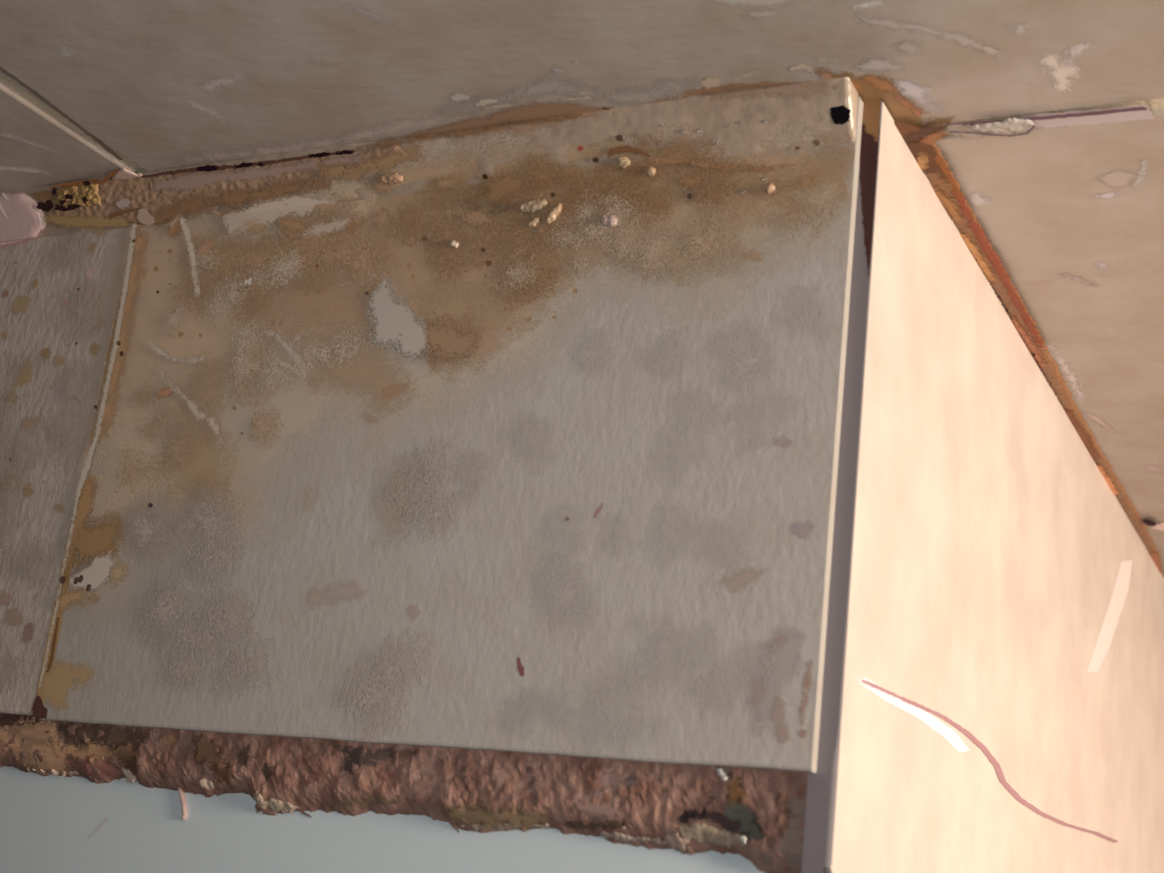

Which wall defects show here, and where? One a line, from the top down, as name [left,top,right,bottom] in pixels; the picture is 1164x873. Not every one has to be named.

rust [811,67,1048,367]
water stain [0,57,880,702]
rust [1063,409,1119,494]
peeling [0,695,808,873]